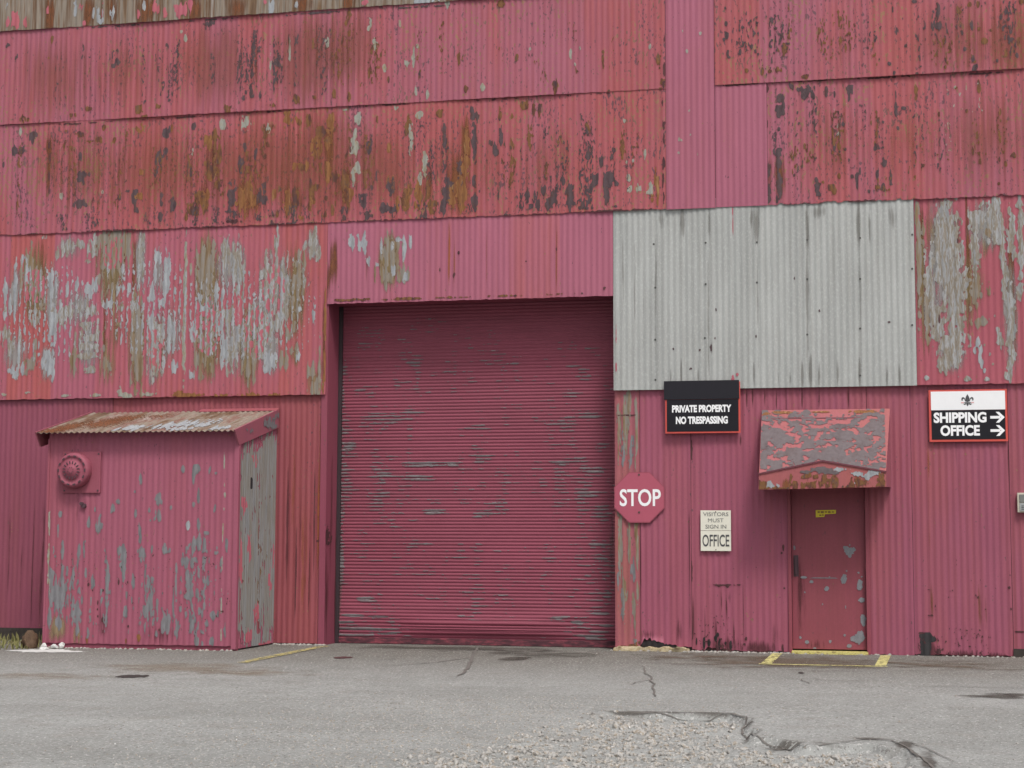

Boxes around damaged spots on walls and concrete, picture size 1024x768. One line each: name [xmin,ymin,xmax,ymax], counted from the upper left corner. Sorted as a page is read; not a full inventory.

rust [46,0,54,28]
rust [67,0,153,29]
rust [169,0,246,23]
rust [286,0,352,16]
rust [46,121,113,187]
peeling [0,0,660,398]
rust [578,121,666,213]
peeling [914,182,1024,383]
rust [39,415,168,433]
peeling [759,408,886,489]
peeling [47,413,279,647]
peeling [801,544,866,648]